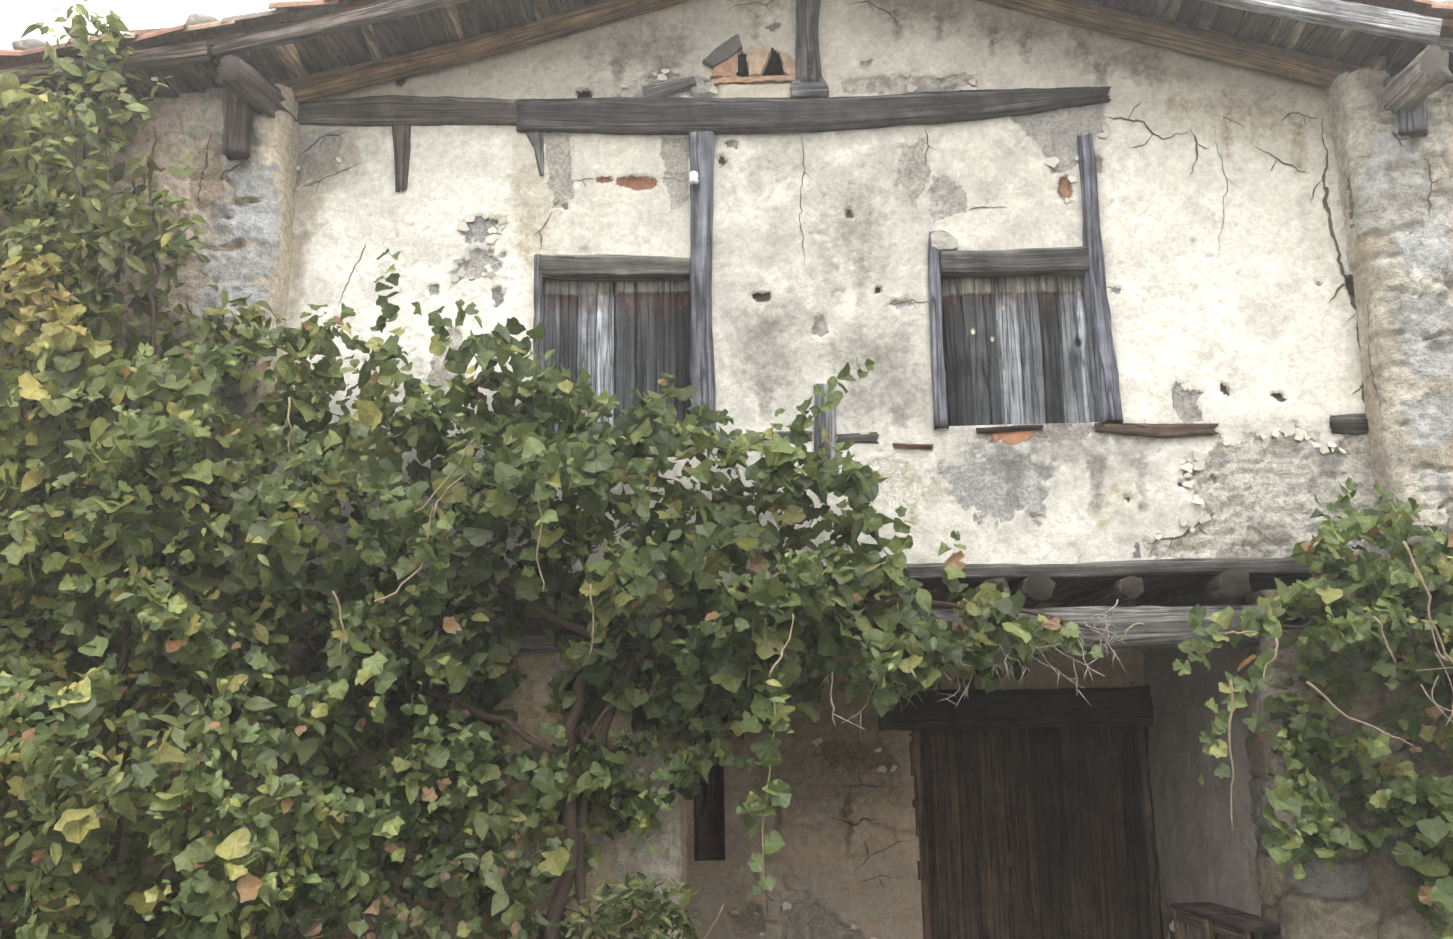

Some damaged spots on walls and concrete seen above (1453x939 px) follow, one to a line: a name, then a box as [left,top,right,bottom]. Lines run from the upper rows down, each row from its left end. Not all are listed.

crack [799,133,814,261]
spalling [428,211,508,308]
crack [1103,101,1381,407]
spalling [1172,382,1230,423]
peeling [1256,423,1346,454]
peeling [1178,454,1211,533]
crack [829,774,911,890]